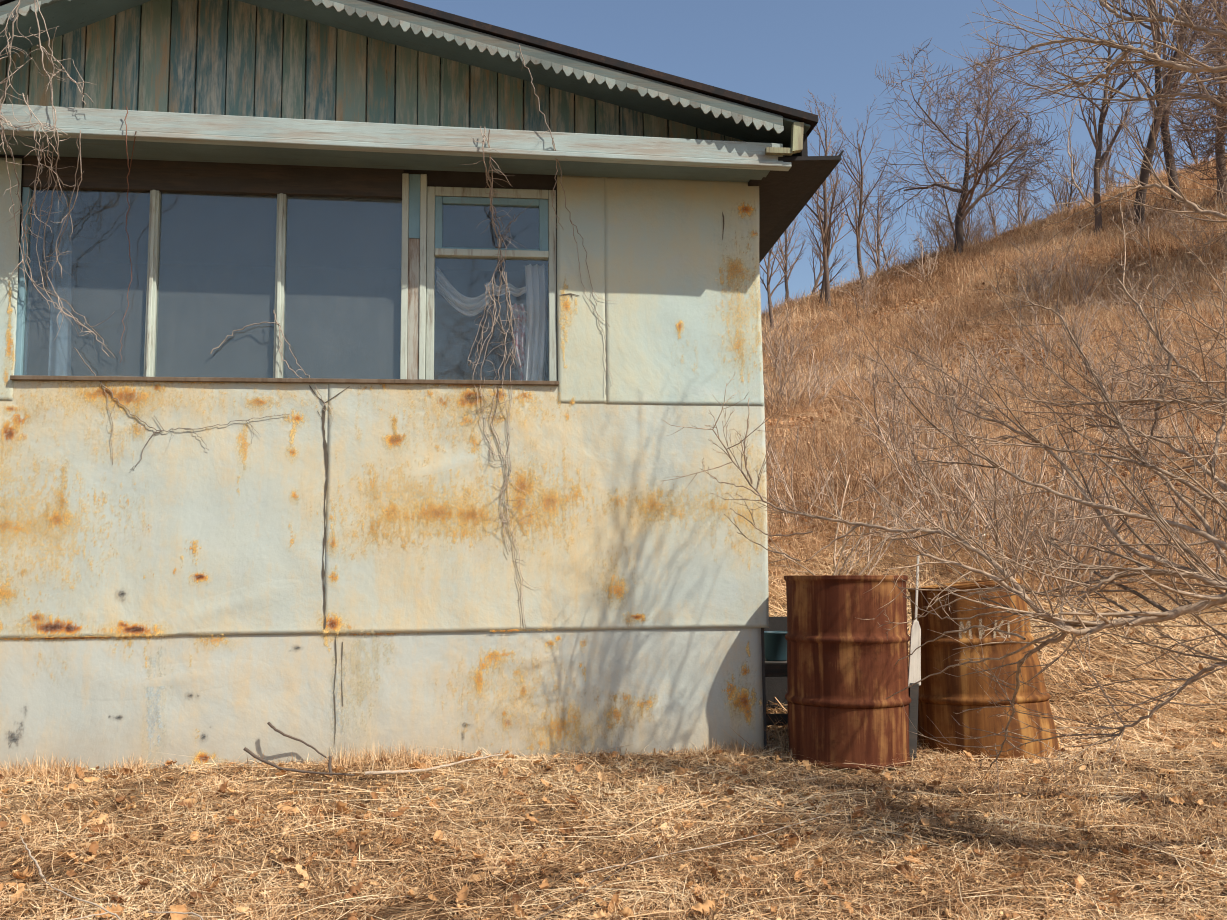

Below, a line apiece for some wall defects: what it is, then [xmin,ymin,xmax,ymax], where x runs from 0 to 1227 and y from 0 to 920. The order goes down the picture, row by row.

corrosion [62,381,223,435]
corrosion [286,411,303,457]
corrosion [382,416,406,449]
corrosion [0,406,104,605]
corrosion [328,462,594,557]
corrosion [173,541,208,582]
corrosion [0,611,164,667]
corrosion [473,650,527,696]
corrosion [724,642,762,725]